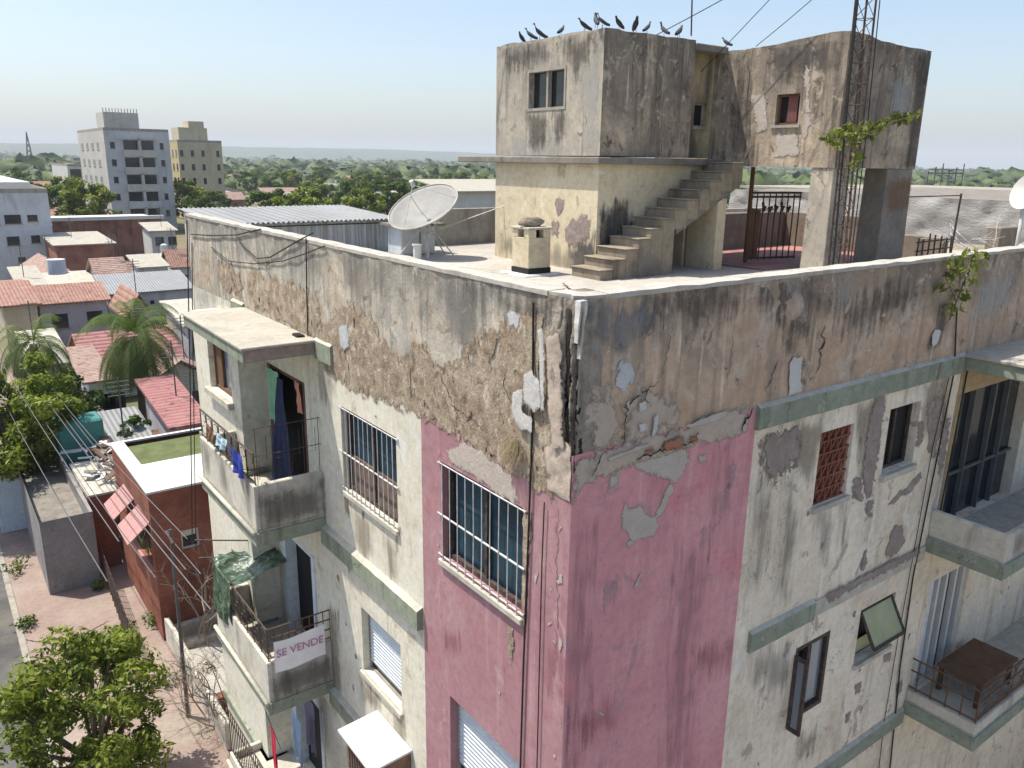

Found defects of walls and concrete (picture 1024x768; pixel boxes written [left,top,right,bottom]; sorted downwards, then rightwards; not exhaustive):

water stain [564,35,598,151]
water stain [514,111,563,154]
peeling [551,198,591,248]
water stain [759,282,819,351]
water stain [838,278,916,334]
peeling [932,329,941,347]
water stain [929,305,946,346]
peeling [789,357,803,396]
peeling [197,258,750,664]
peeling [758,425,803,485]
peeling [852,395,886,521]
peeling [826,525,920,603]